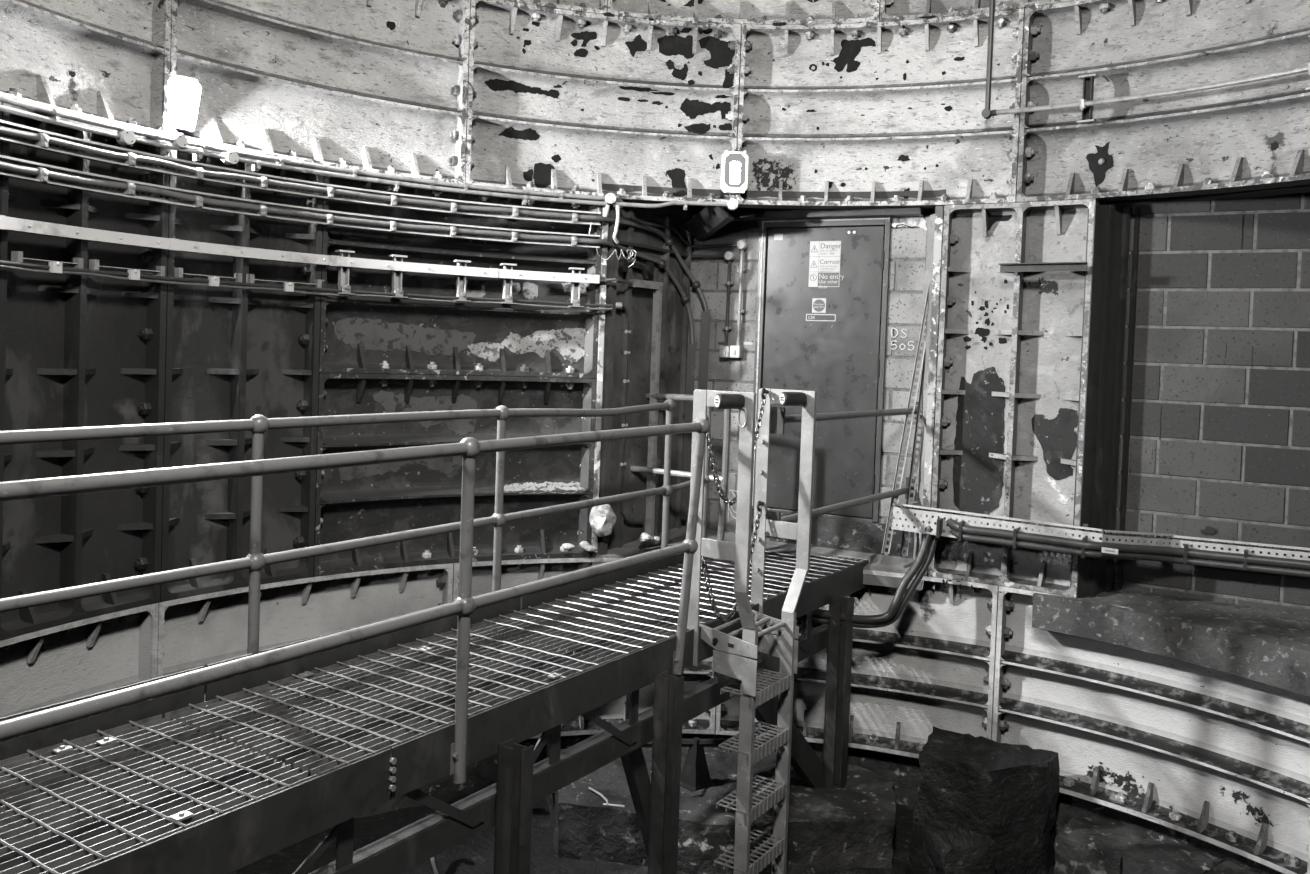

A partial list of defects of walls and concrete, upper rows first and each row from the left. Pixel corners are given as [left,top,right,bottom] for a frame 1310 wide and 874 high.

peeling [516,22,540,54]
peeling [571,12,614,57]
peeling [618,24,735,135]
peeling [809,35,876,79]
peeling [963,279,1009,350]
peeling [953,367,1006,514]
peeling [1031,408,1078,480]